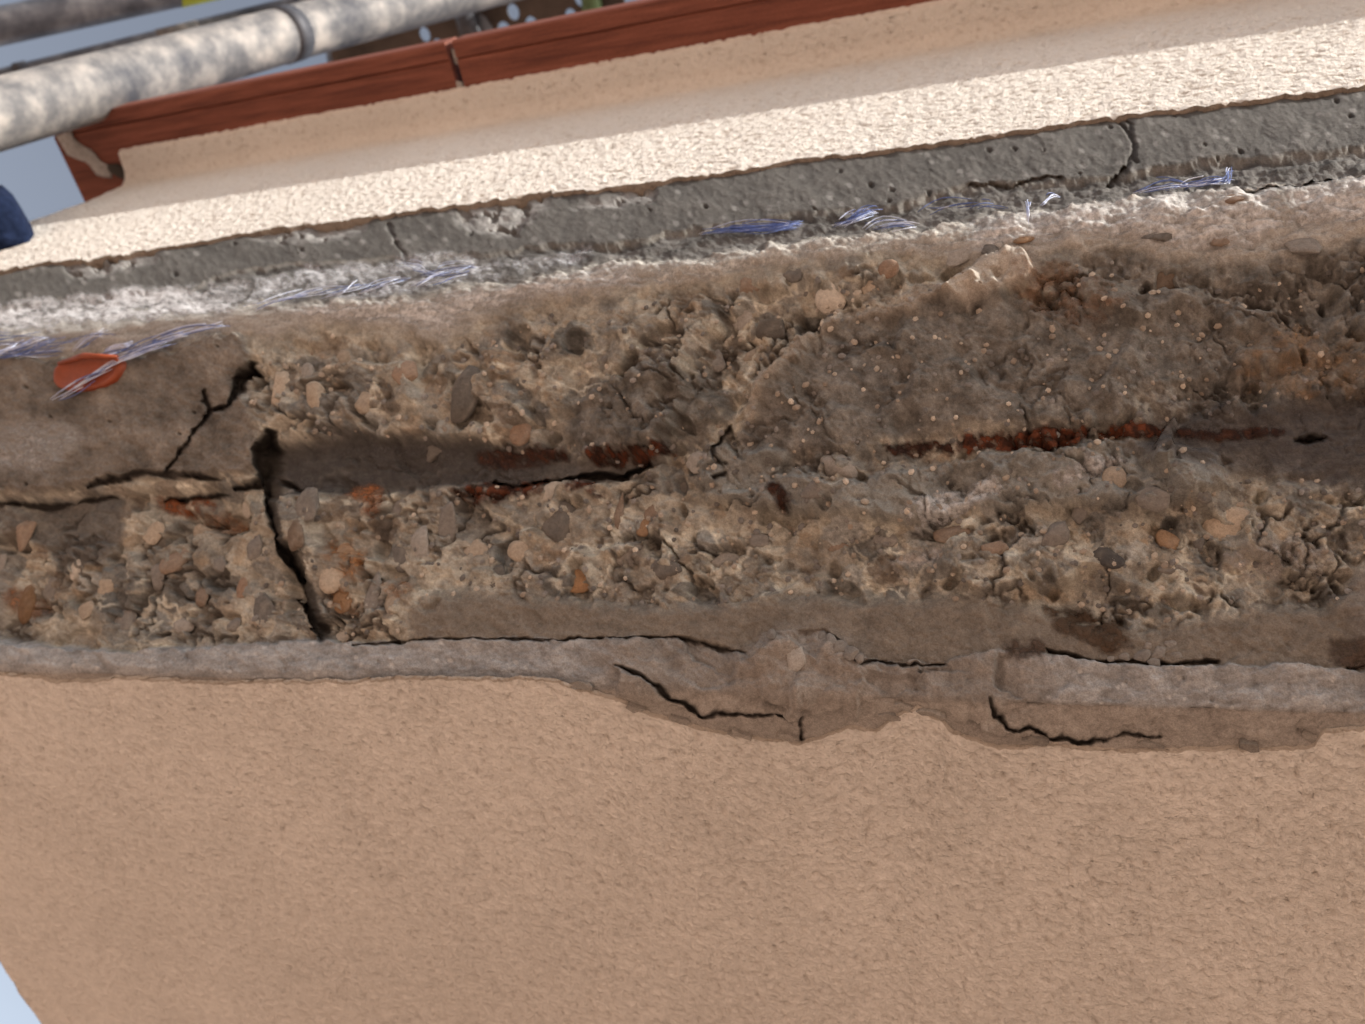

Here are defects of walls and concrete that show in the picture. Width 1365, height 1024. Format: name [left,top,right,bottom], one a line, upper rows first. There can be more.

crack [969,176,1062,190]
crack [1106,119,1137,189]
corrosion [452,444,568,505]
corrosion [585,440,676,469]
spalling [0,148,1365,672]
corrosion [767,482,789,514]
corrosion [887,420,1285,458]
crack [0,361,804,741]
flaking render [569,681,1327,753]
crack [990,698,1153,746]